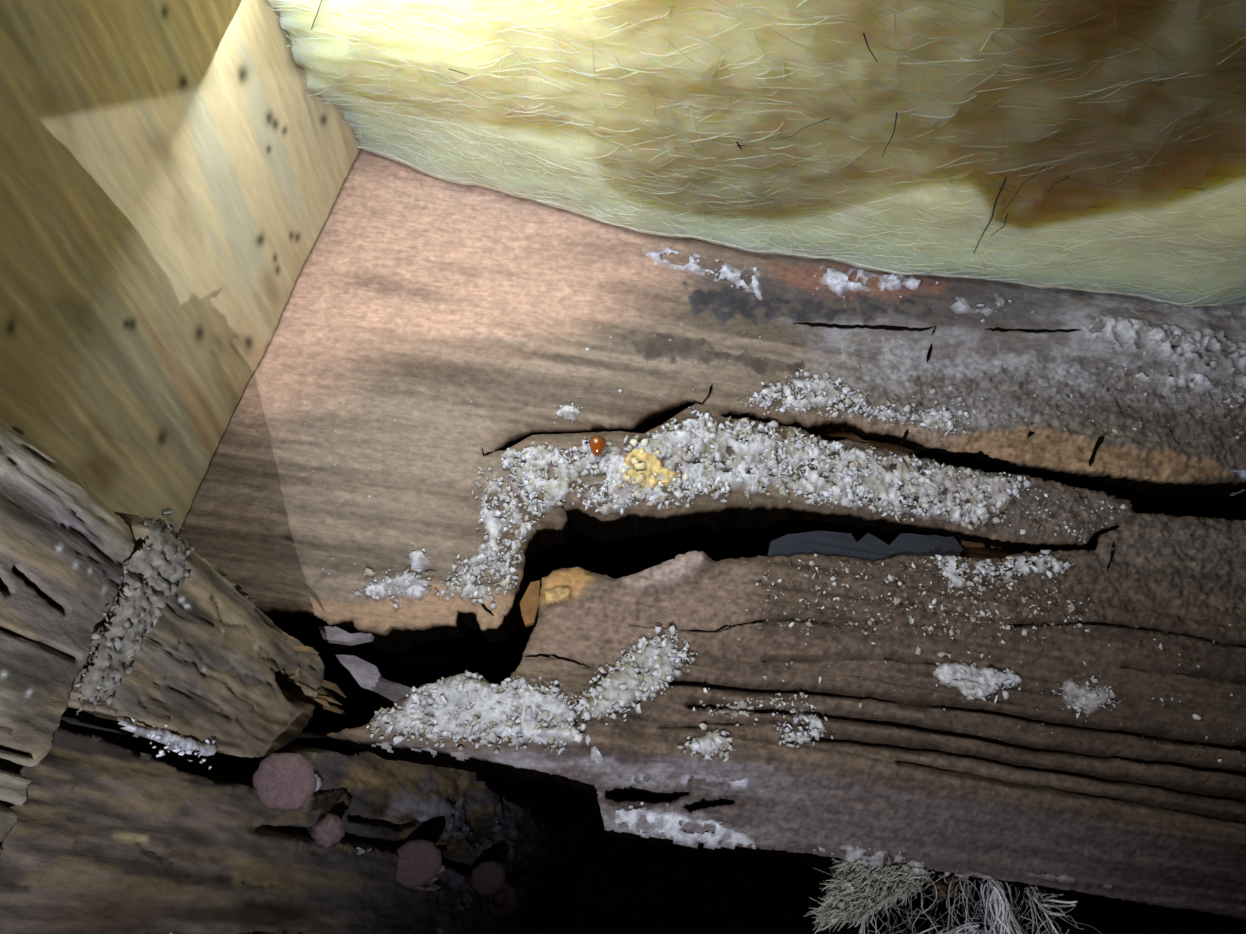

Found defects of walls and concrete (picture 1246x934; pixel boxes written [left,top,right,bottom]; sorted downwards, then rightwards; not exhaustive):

damp [986,298,1246,406]
crack [694,384,713,404]
crack [899,429,909,447]
crack [1089,436,1105,467]
crack [1107,542,1116,571]
crack [288,500,770,748]
damp [411,747,472,761]